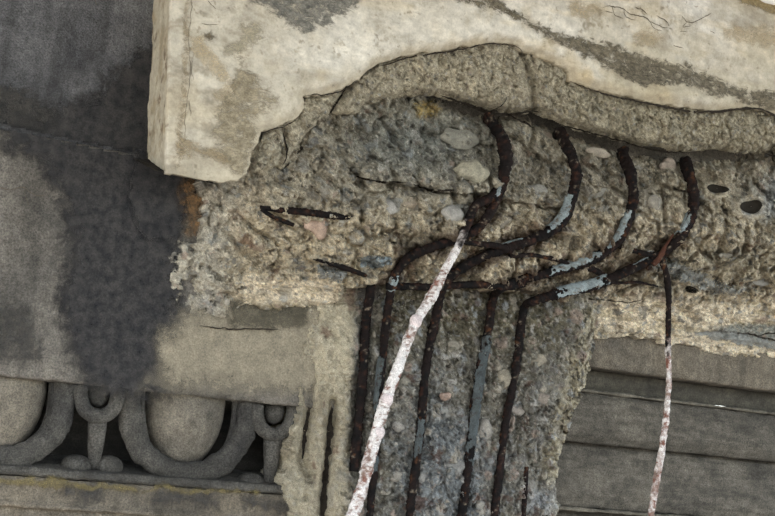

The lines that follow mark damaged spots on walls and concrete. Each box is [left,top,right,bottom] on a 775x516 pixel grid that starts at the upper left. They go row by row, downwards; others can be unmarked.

leakage [252,0,359,34]
leakage [458,0,775,110]
crack [603,6,714,48]
rust [178,178,204,237]
spalling [158,95,775,516]